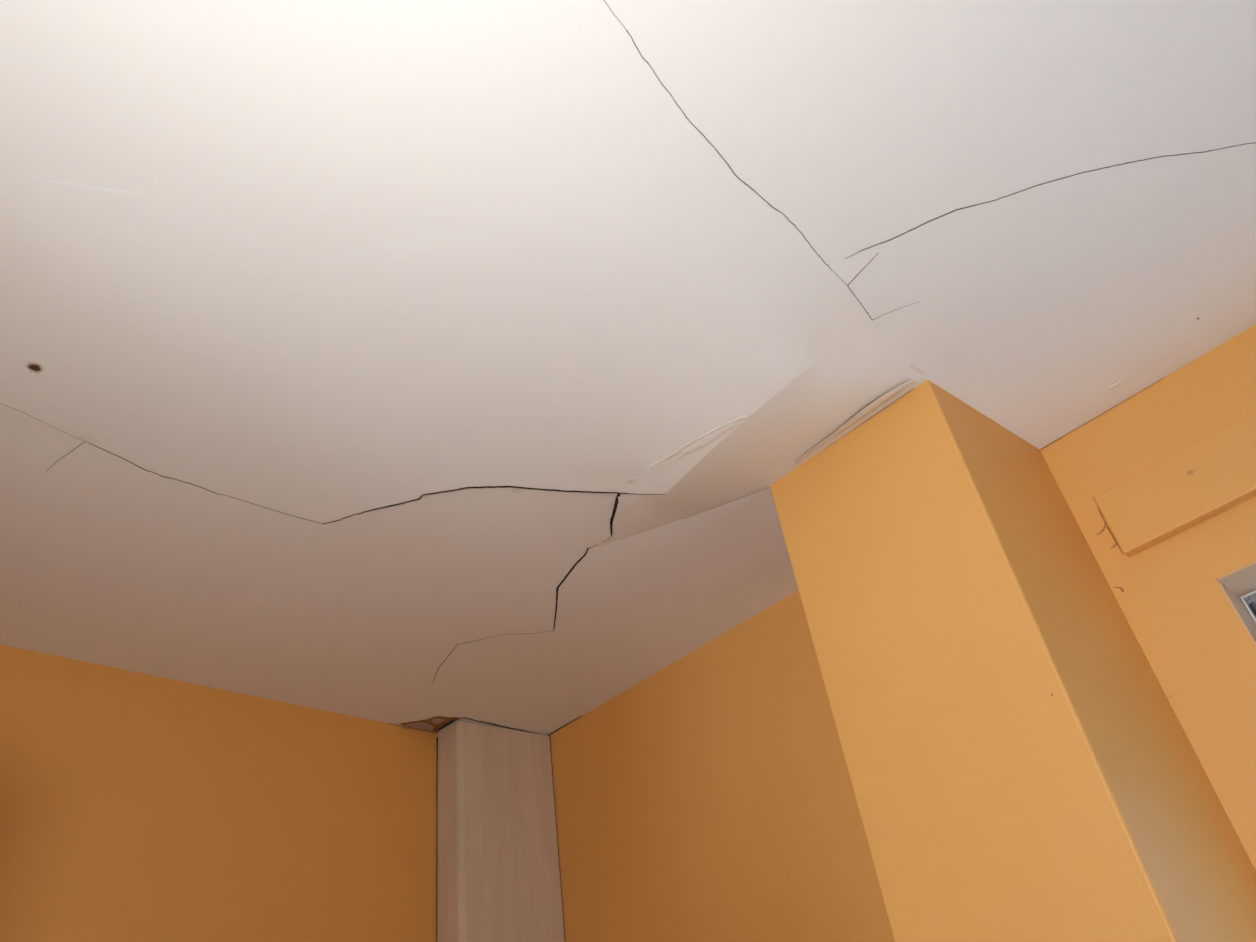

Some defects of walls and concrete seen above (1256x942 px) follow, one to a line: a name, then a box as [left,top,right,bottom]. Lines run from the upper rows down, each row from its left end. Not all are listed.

crack [603,0,1256,320]
crack [0,403,663,681]